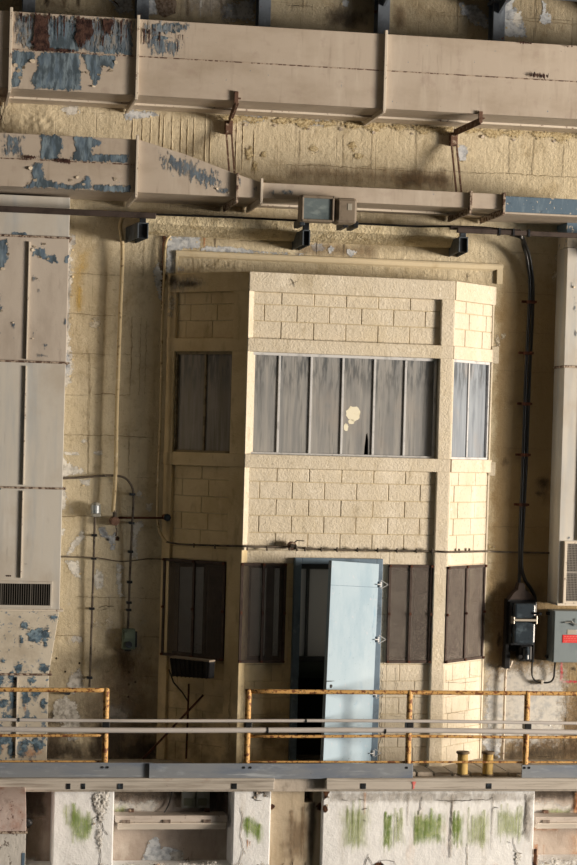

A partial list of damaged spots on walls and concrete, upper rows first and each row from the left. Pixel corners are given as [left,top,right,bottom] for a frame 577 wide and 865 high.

rust [15,12,123,53]
peeling [11,0,190,92]
peeling [505,0,527,39]
peeling [539,0,551,25]
peeling [24,133,131,193]
peeling [159,153,229,195]
peeling [0,232,27,268]
peeling [20,614,59,648]
spalling [0,657,84,741]
peeling [0,733,46,758]
peeling [127,837,217,865]
crack [419,798,497,865]